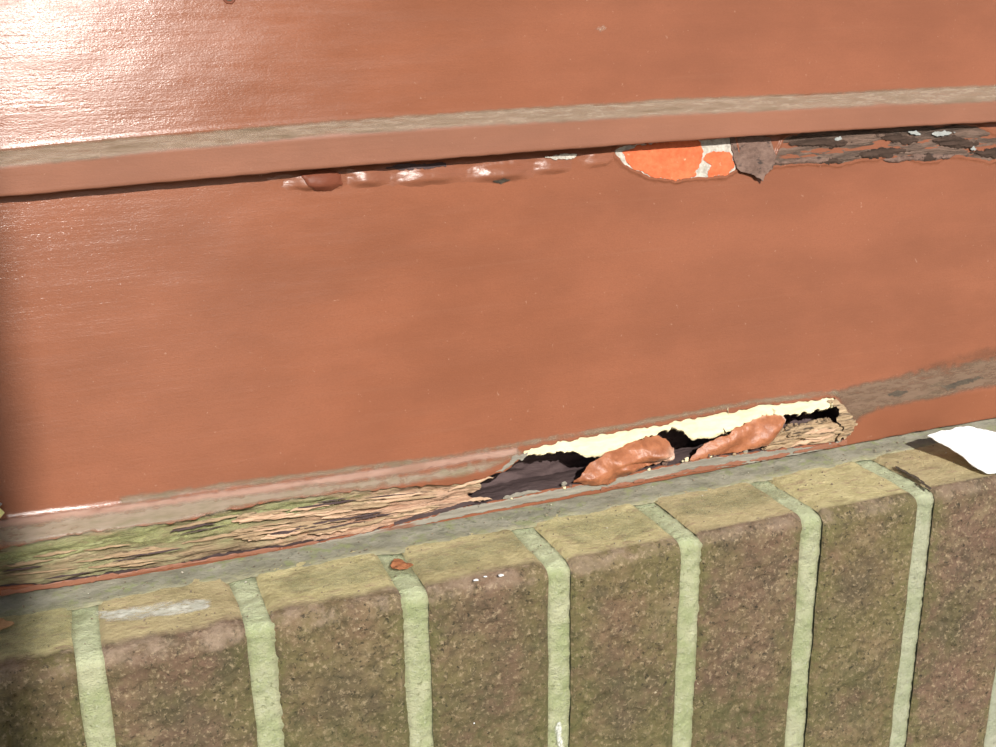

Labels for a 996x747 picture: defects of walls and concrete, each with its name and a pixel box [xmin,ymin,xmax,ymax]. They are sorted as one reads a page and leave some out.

spalling [611,136,776,185]
peeling [573,435,675,486]
peeling [690,414,786,461]